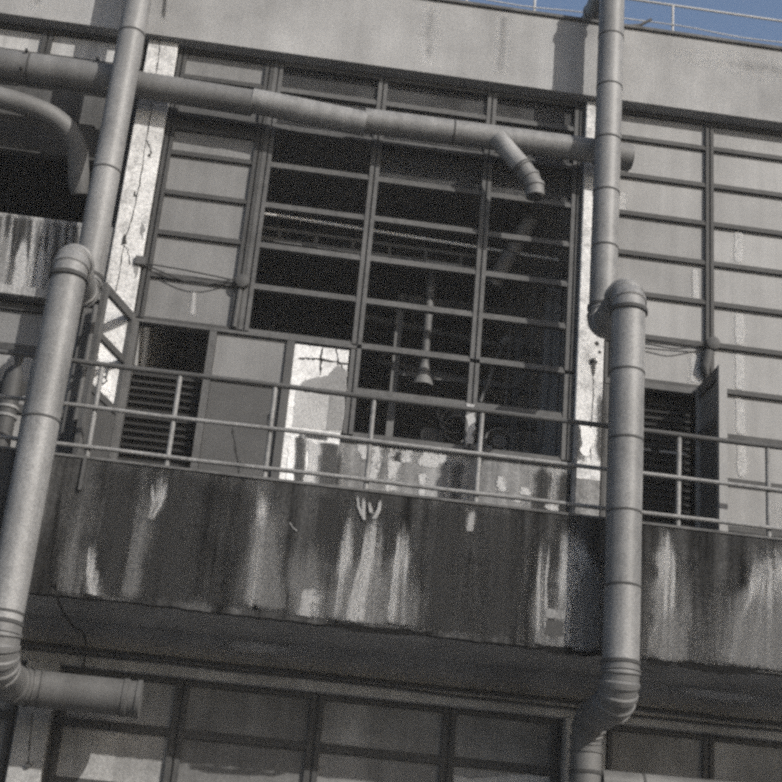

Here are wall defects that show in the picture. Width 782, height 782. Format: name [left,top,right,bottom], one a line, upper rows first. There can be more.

damp [0,215,79,288]
damp [294,434,342,485]
damp [532,469,571,512]
peeling [580,426,596,456]
damp [86,464,519,634]
damp [533,540,600,651]
efflorescence [648,535,691,661]
efflorescence [723,554,782,669]